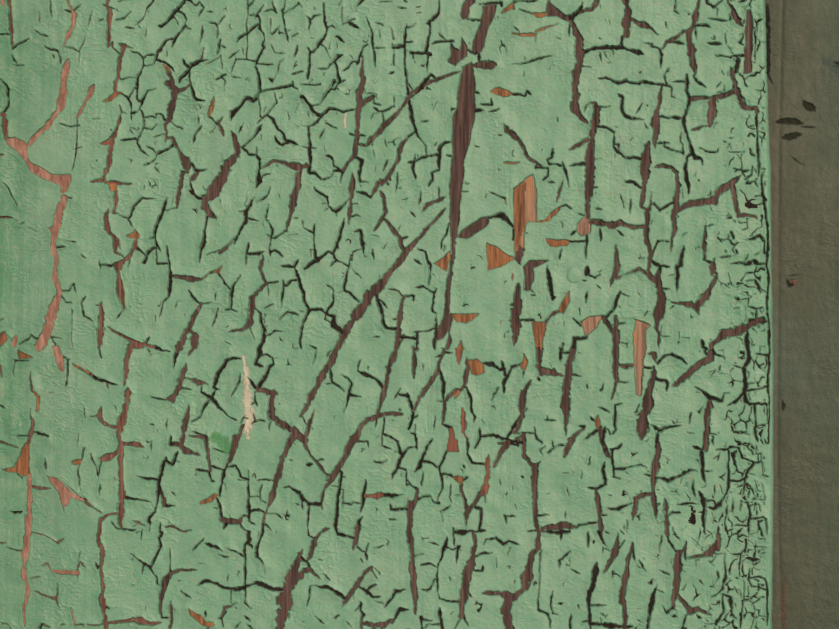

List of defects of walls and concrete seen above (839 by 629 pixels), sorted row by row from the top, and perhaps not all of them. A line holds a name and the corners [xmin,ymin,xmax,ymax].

crack [0,0,61,66]
peeling [63,0,79,52]
peeling [409,0,571,349]
peeling [0,59,95,372]
peeling [546,214,591,259]
crack [0,320,14,346]
crack [63,0,663,629]
peeling [618,320,651,396]
crack [568,0,772,629]
crack [0,371,53,448]
peeling [4,444,104,626]
crack [35,588,59,629]